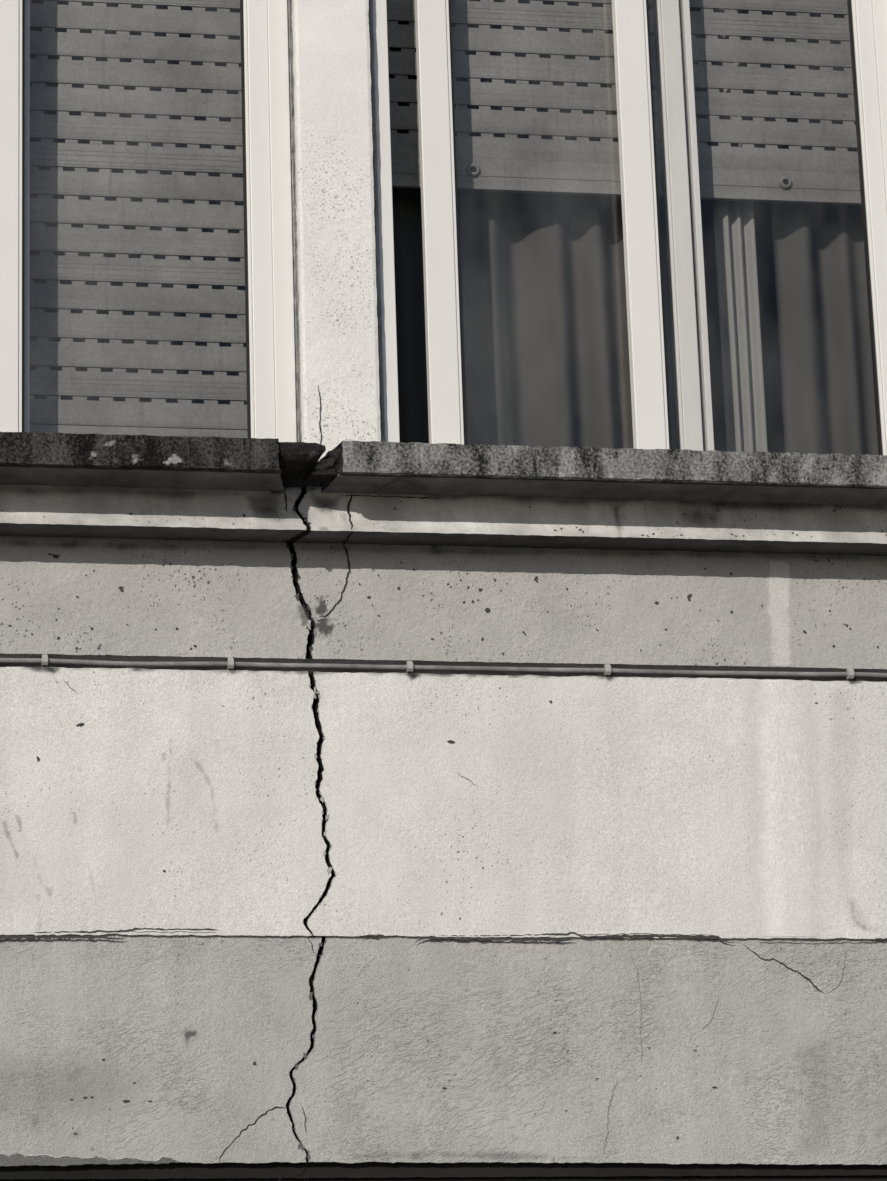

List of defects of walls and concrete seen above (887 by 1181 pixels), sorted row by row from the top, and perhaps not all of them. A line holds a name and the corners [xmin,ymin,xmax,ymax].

crack [219,479,435,1181]
crack [746,946,847,994]
peeling [0,1153,187,1166]